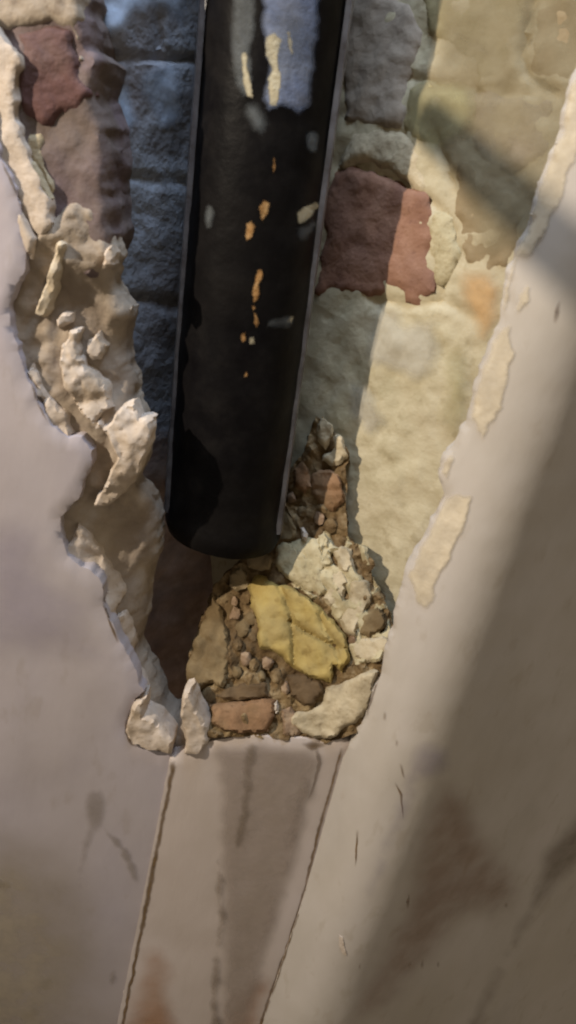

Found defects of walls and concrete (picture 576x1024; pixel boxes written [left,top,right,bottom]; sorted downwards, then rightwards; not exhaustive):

peeling [518,82,576,254]
flaking render [0,27,211,754]
peeling [473,328,514,434]
peeling [409,495,471,606]
water stain [212,747,313,1024]